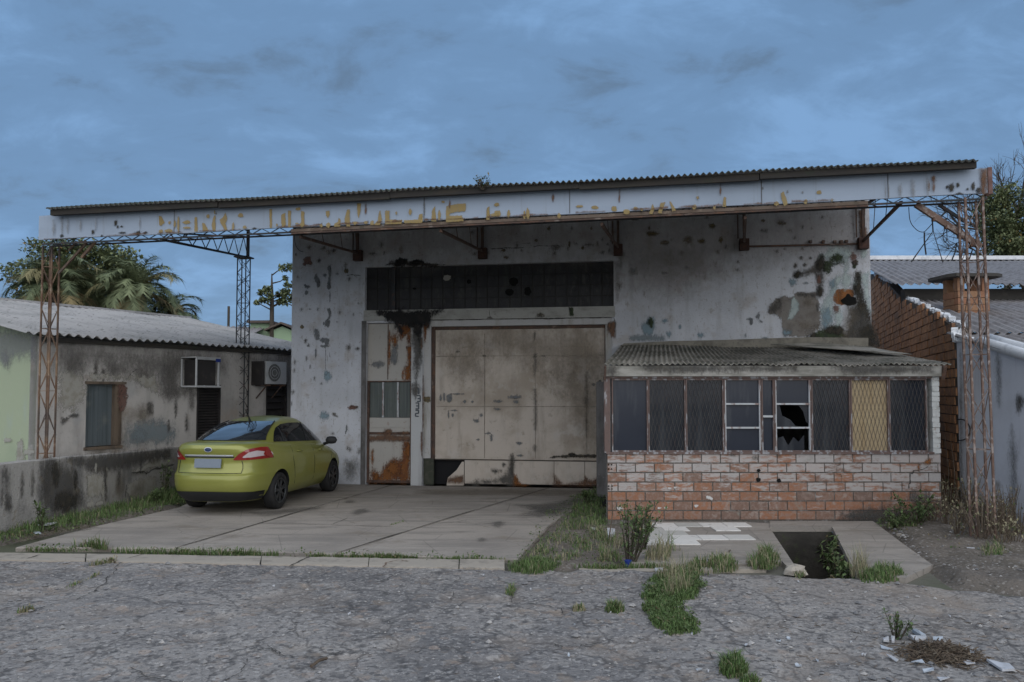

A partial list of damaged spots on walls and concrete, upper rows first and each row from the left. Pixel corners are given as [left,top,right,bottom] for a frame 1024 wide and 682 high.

spalling [745,221,870,337]
damp [1,350,193,518]
corrosion [369,325,428,483]
damp [411,327,422,399]